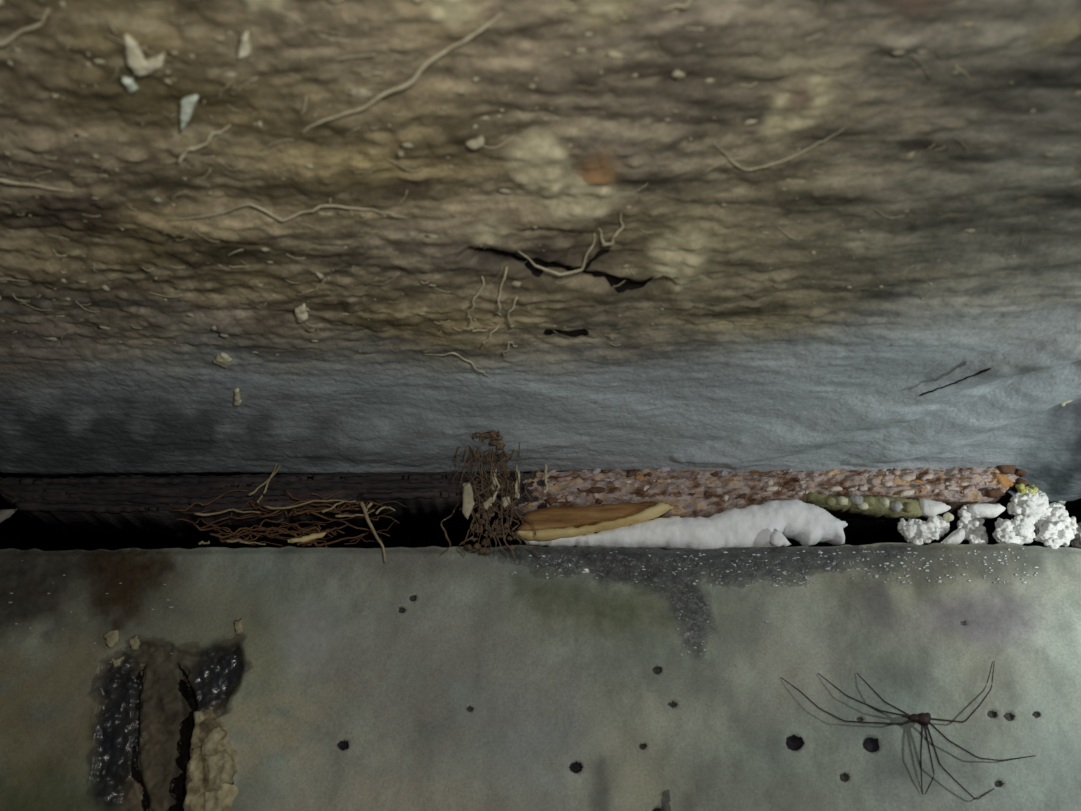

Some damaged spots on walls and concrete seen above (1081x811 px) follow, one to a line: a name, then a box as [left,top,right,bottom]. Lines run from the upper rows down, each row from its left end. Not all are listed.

water stain [507,545,1039,657]
crack [131,663,198,811]
spalling [92,618,247,811]